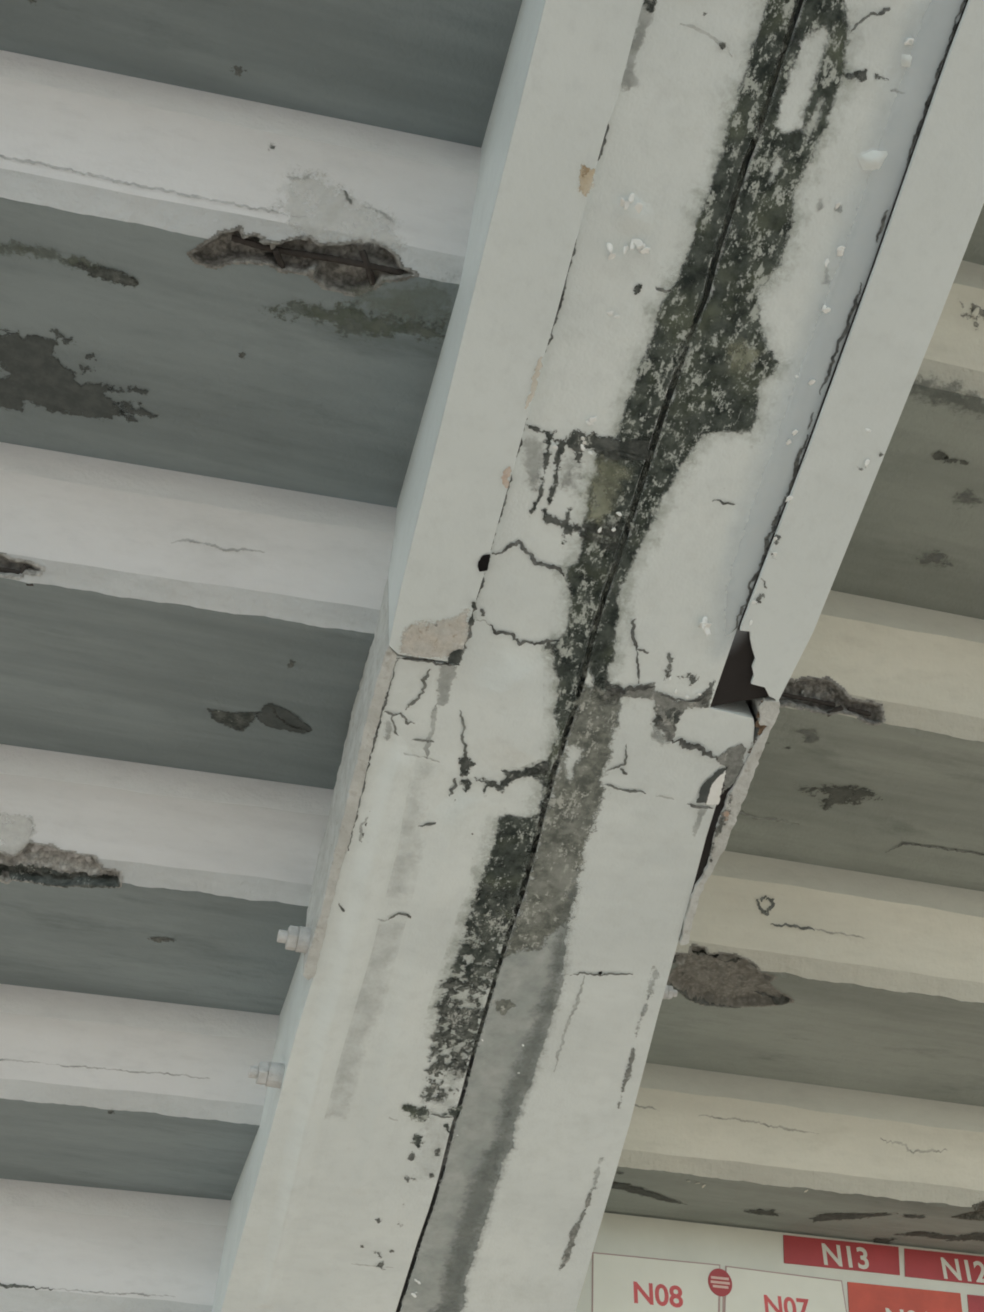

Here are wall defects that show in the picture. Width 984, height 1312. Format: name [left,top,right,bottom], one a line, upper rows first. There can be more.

crack [907,0,967,165]
water stain [0,242,138,287]
spalling [187,225,419,297]
water stain [269,300,445,341]
peeling [0,329,159,422]
crack [732,282,862,632]
crack [348,418,565,851]
water stain [400,0,849,1312]
crack [601,619,718,794]
spalling [779,676,886,726]
spalling [0,840,123,889]
spalling [667,943,794,1008]